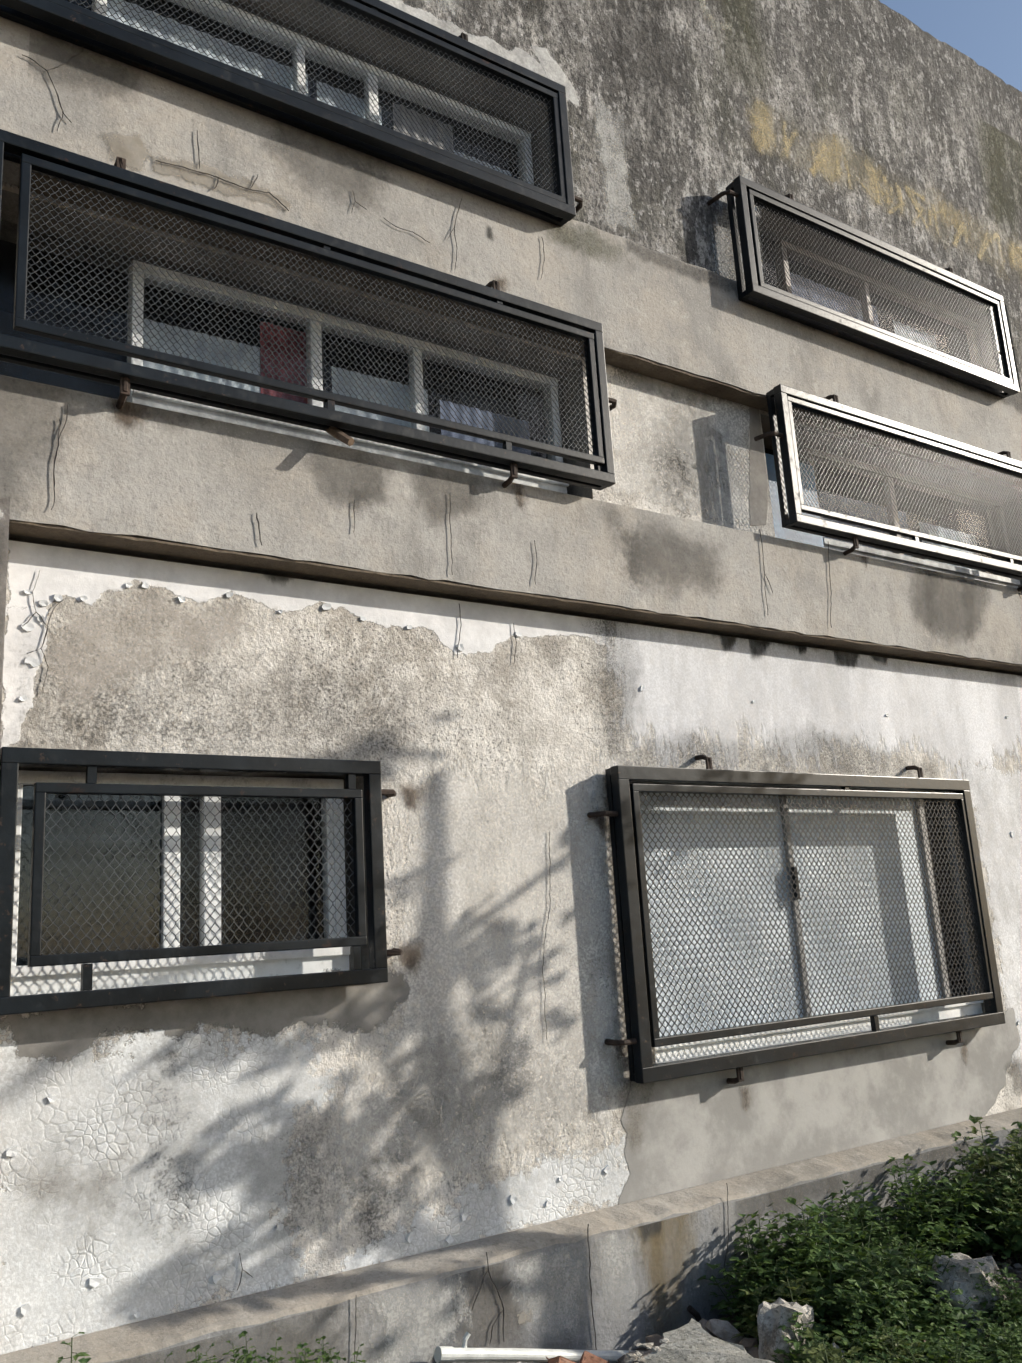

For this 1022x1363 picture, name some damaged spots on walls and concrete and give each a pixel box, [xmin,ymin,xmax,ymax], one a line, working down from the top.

crack [23,46,84,131]
crack [156,130,289,211]
crack [51,405,68,510]
leakage [420,473,472,516]
leakage [632,537,712,583]
leakage [916,571,986,634]
peeling [0,540,1022,1084]
crack [542,833,551,1039]
peeling [0,755,630,1355]
leakage [600,1221,661,1301]